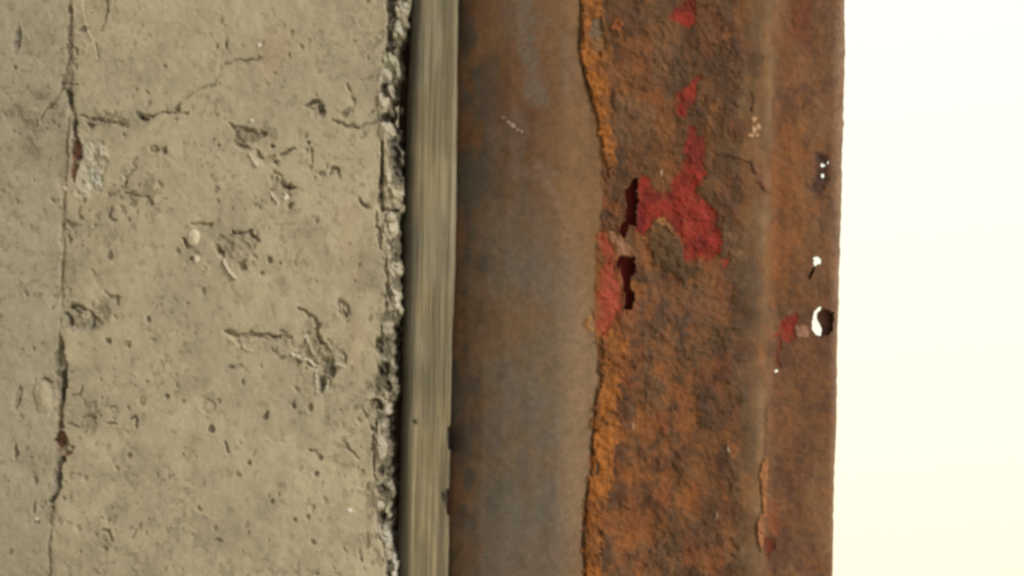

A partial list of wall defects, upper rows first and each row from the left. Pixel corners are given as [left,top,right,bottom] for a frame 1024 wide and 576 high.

crack [38,0,264,144]
rust [577,0,625,180]
rust [783,0,817,62]
crack [56,193,88,294]
spalling [221,0,412,576]
peeling [582,73,732,339]
rust [639,217,708,287]
rust [762,102,833,312]
crack [44,330,71,576]
rust [579,328,630,576]
rust [753,456,784,561]